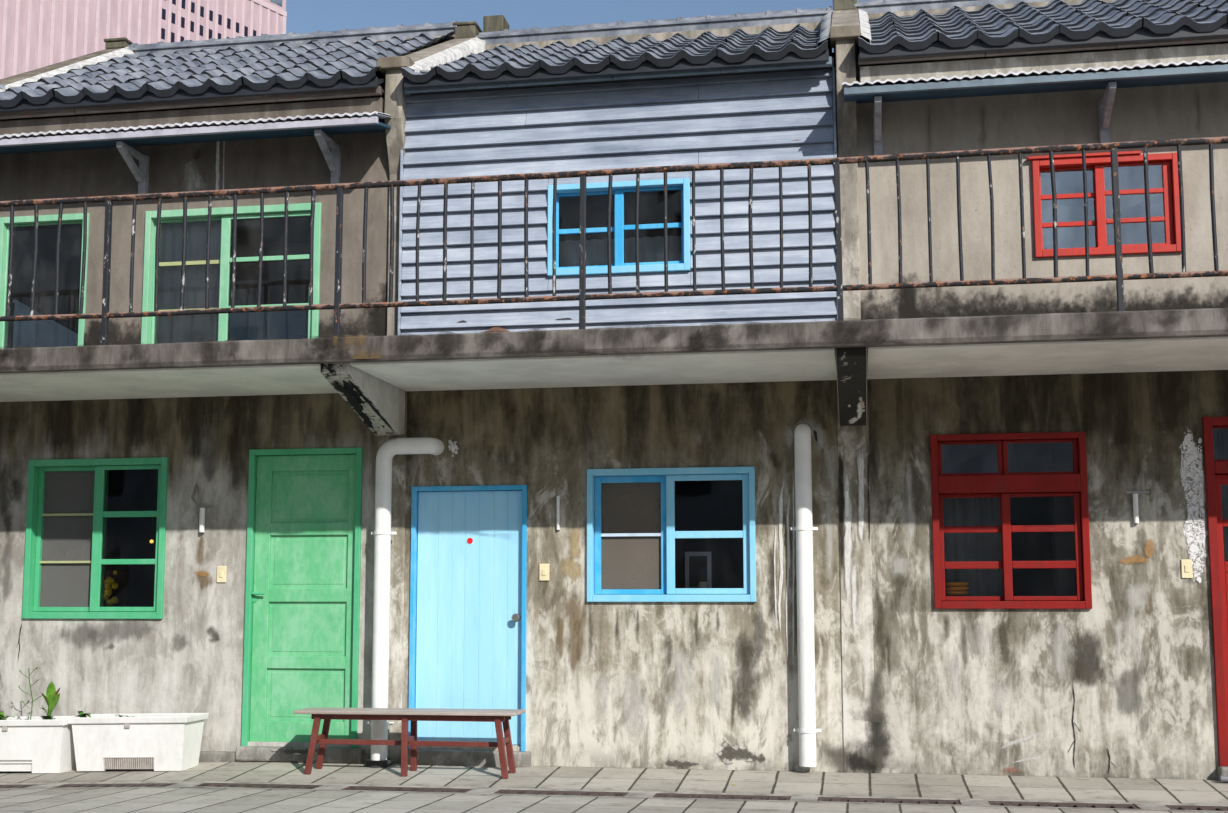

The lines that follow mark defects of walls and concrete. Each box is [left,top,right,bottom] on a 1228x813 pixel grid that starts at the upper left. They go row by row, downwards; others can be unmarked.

damp [834,280,1228,344]
peeling [331,380,393,433]
peeling [848,397,865,423]
damp [0,466,22,595]
damp [838,445,870,628]
peeling [1178,428,1208,583]
damp [557,599,592,669]
damp [711,478,795,724]
damp [827,592,890,773]
damp [951,625,1009,694]
damp [1054,623,1101,683]
damp [1119,672,1140,713]